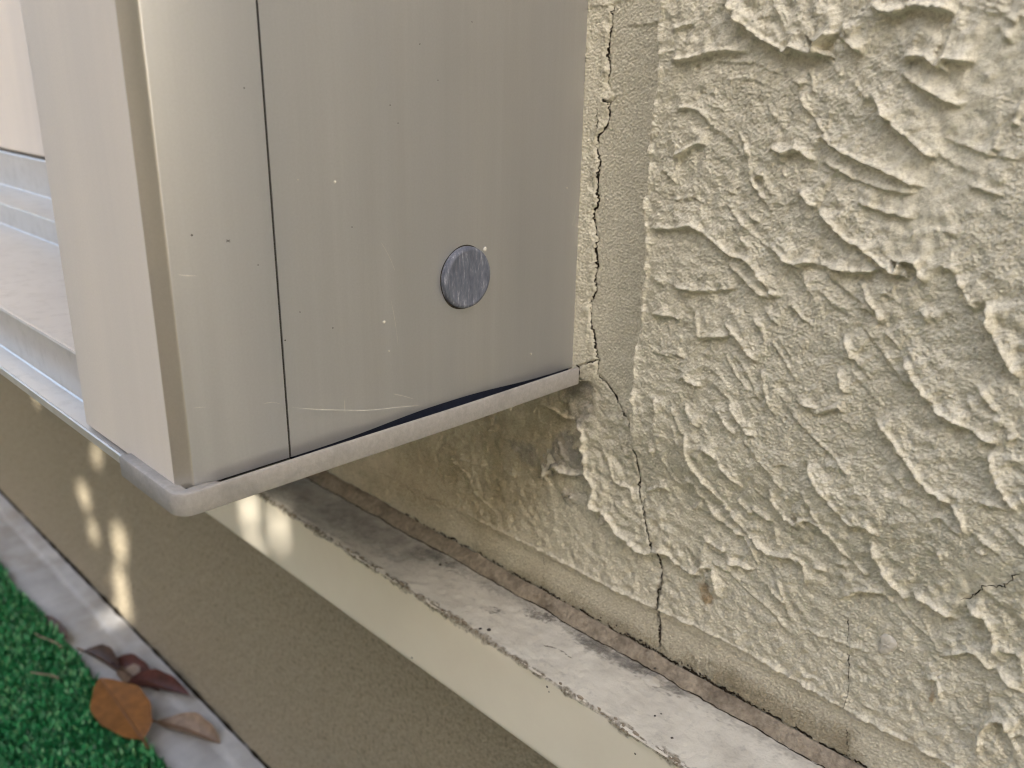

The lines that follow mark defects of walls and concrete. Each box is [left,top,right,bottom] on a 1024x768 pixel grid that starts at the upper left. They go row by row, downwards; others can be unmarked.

crack [305,8,867,768]
crack [961,573,1020,600]